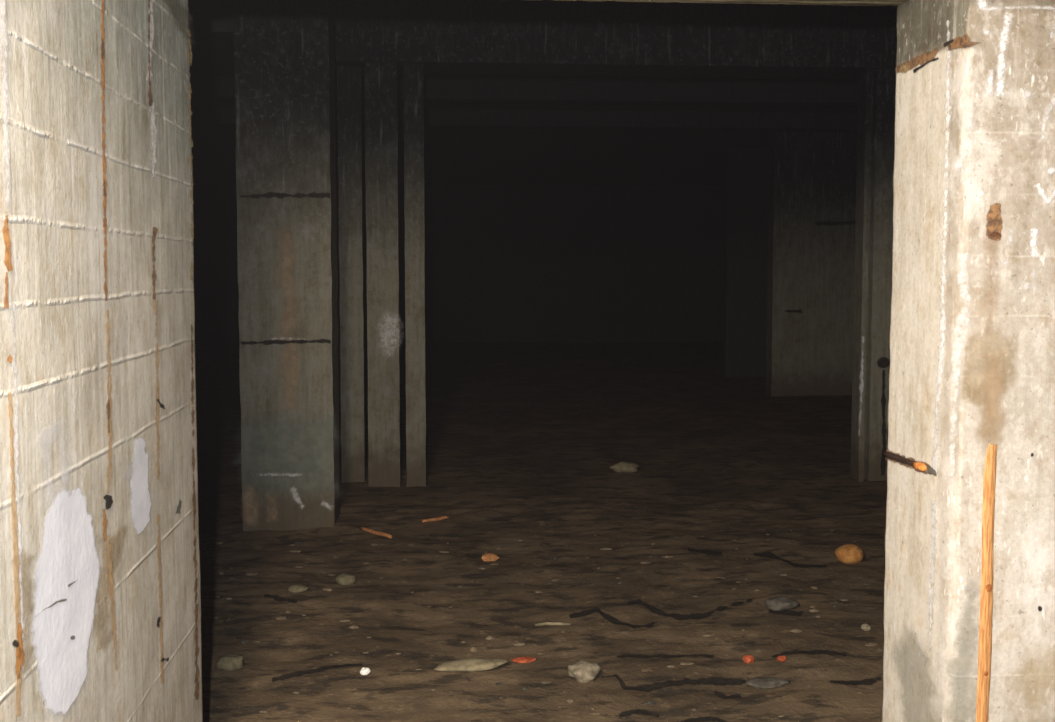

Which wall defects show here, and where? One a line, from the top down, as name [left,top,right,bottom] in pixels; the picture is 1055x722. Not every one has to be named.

rust [2,215,13,308]
rust [101,0,112,493]
rust [152,227,160,479]
rust [986,203,1002,241]
rust [8,393,24,716]